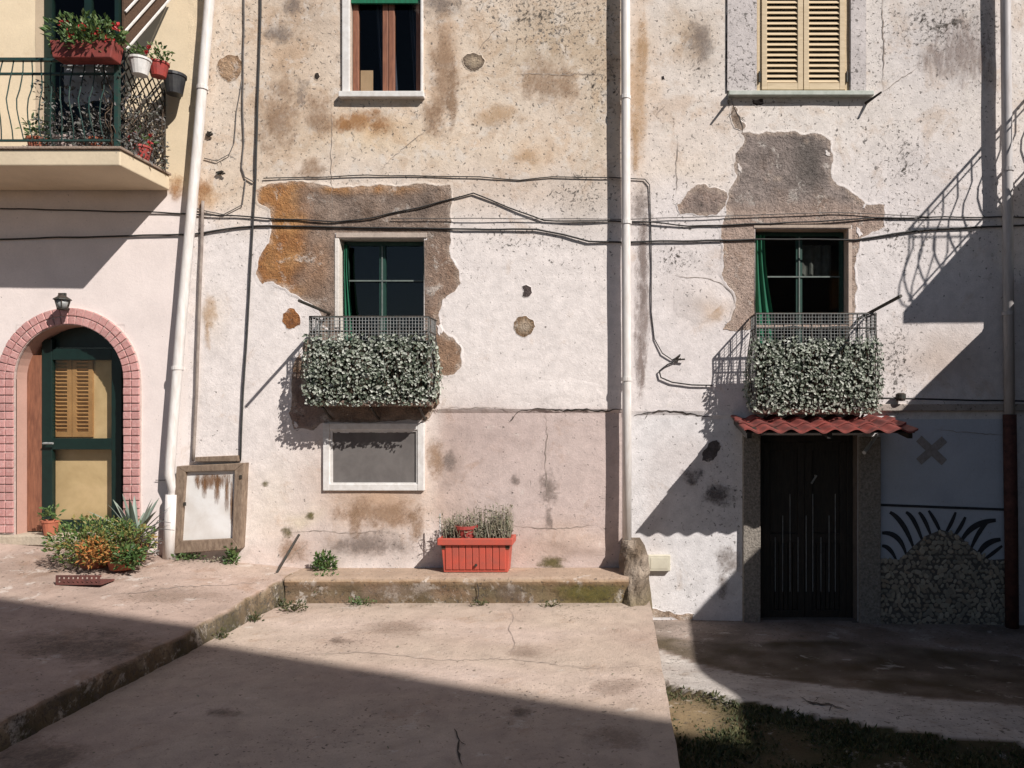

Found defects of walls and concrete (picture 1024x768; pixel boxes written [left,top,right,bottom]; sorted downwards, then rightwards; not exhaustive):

spalling [216,54,243,83]
spalling [462,52,485,72]
spalling [676,102,888,331]
spalling [253,160,465,433]
spalling [522,284,532,298]
spalling [513,315,536,338]
crack [442,407,712,529]
leakage [706,487,727,502]
leakage [339,505,421,551]
crack [454,729,466,764]